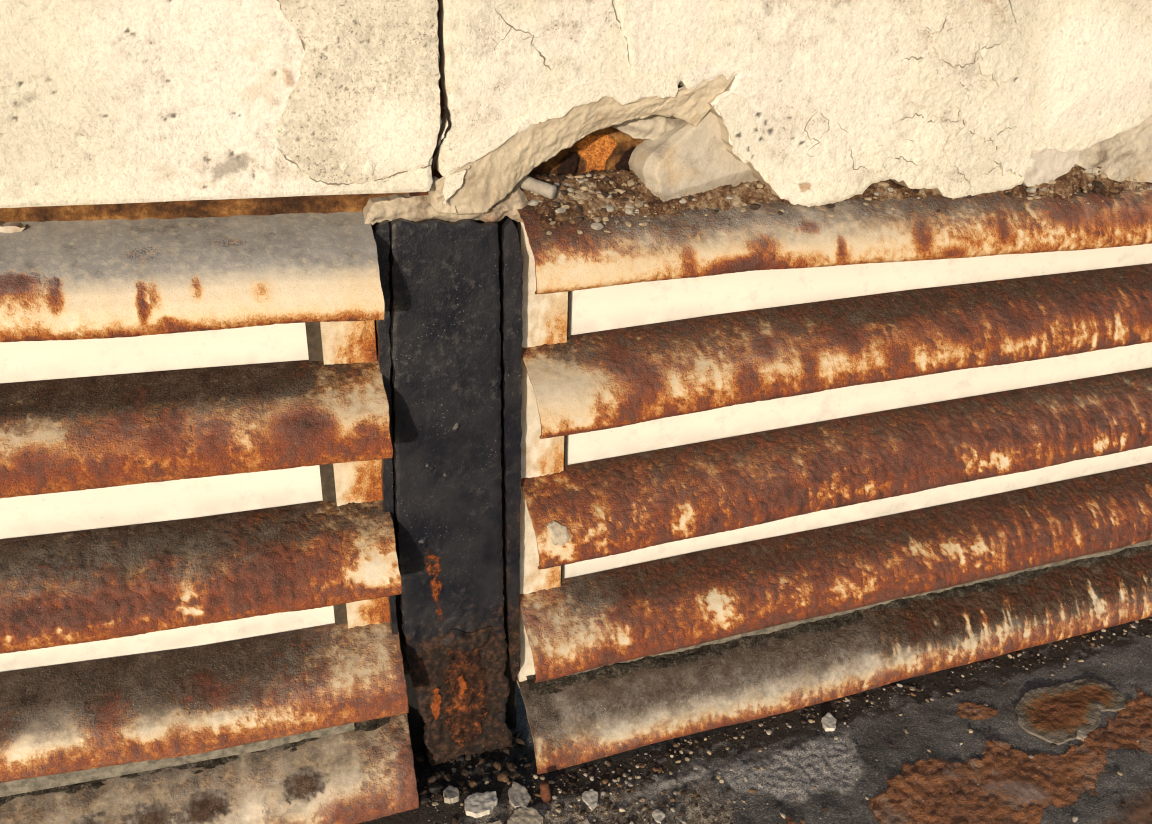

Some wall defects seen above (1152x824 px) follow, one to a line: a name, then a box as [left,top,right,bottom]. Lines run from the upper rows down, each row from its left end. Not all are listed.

crack [409,0,451,196]
crack [493,9,551,70]
peeling [274,0,806,215]
crack [612,0,631,65]
peeling [849,0,1152,187]
corrosion [426,549,497,747]
corrosion [868,689,1152,824]